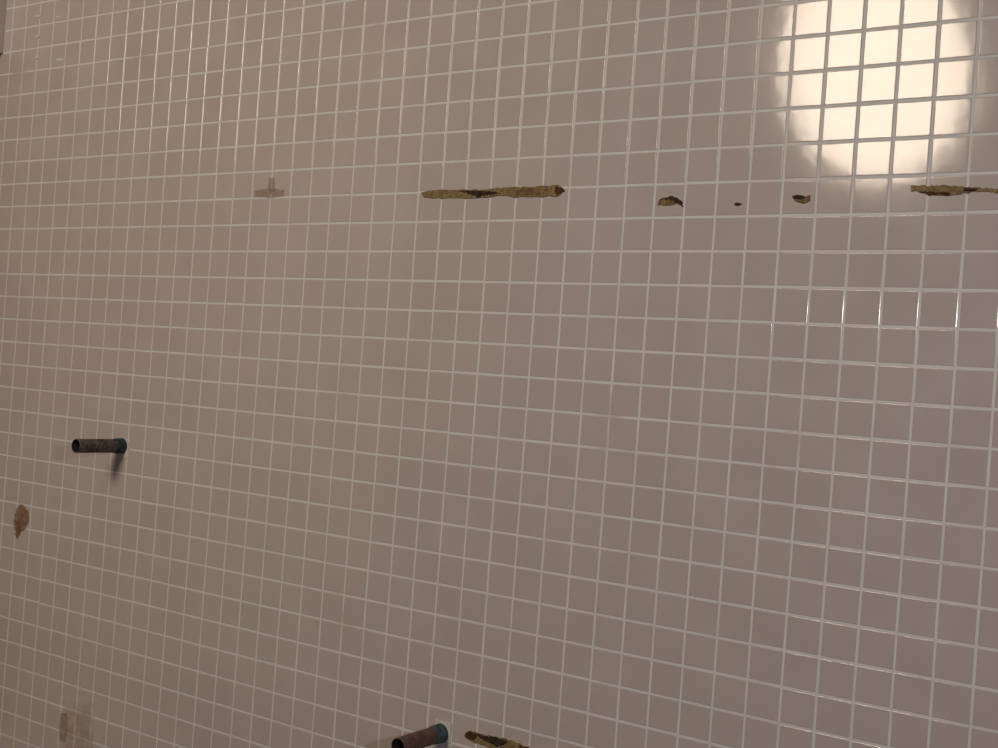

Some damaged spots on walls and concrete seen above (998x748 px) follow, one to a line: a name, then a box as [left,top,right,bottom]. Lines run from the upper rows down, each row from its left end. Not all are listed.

rust [13,504,29,539]